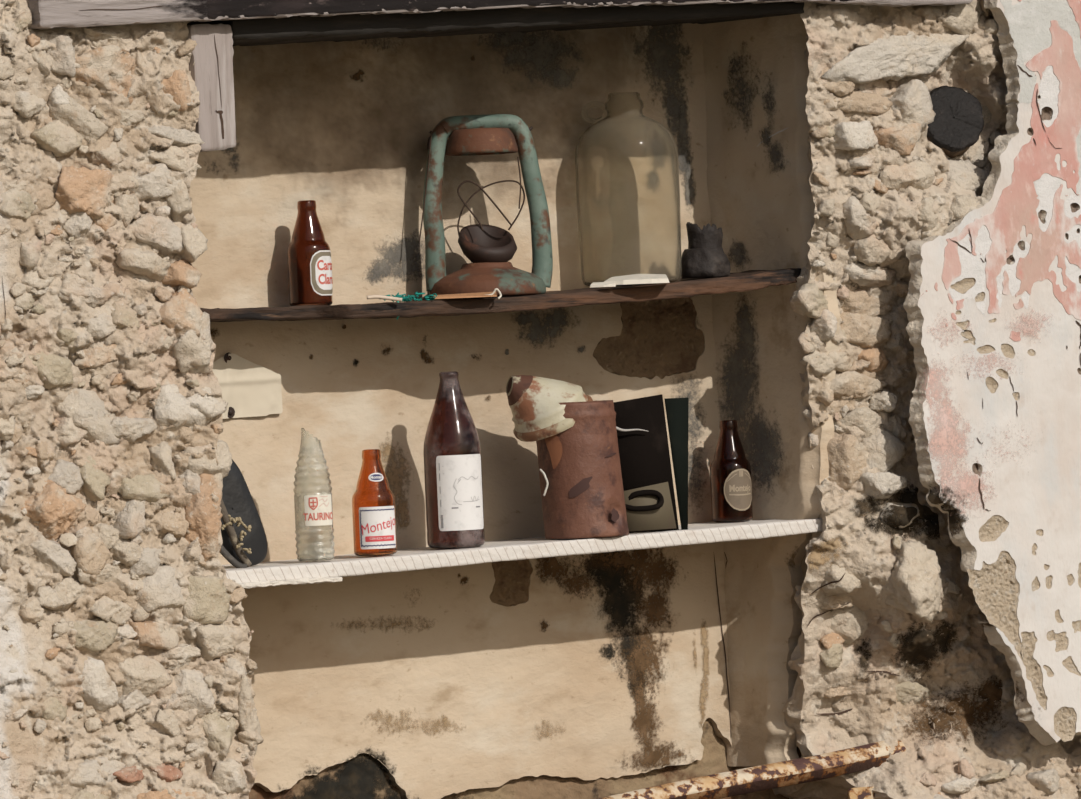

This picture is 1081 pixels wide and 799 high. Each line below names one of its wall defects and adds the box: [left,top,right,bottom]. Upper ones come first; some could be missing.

leakage [724,56,785,171]
peeling [1000,0,1081,127]
peeling [1035,130,1081,248]
flaking render [593,298,705,379]
leakage [728,242,750,267]
peeling [931,225,1047,393]
peeling [1065,256,1081,292]
peeling [922,366,986,514]
leakage [536,547,684,776]
flaking render [967,516,1081,742]
leakage [372,710,459,735]